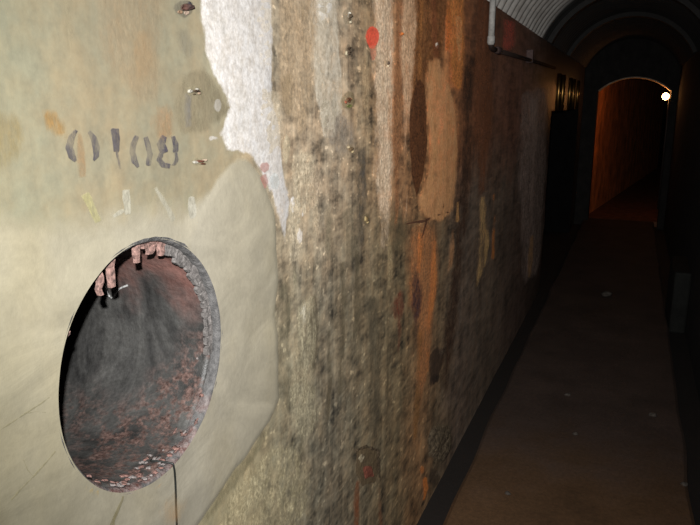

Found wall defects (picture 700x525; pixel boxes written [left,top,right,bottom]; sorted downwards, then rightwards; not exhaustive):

peeling [178,0,289,231]
water stain [376,0,392,215]
water stain [401,0,416,111]
water stain [357,151,367,243]
rust [410,227,437,386]
rust [86,446,180,487]